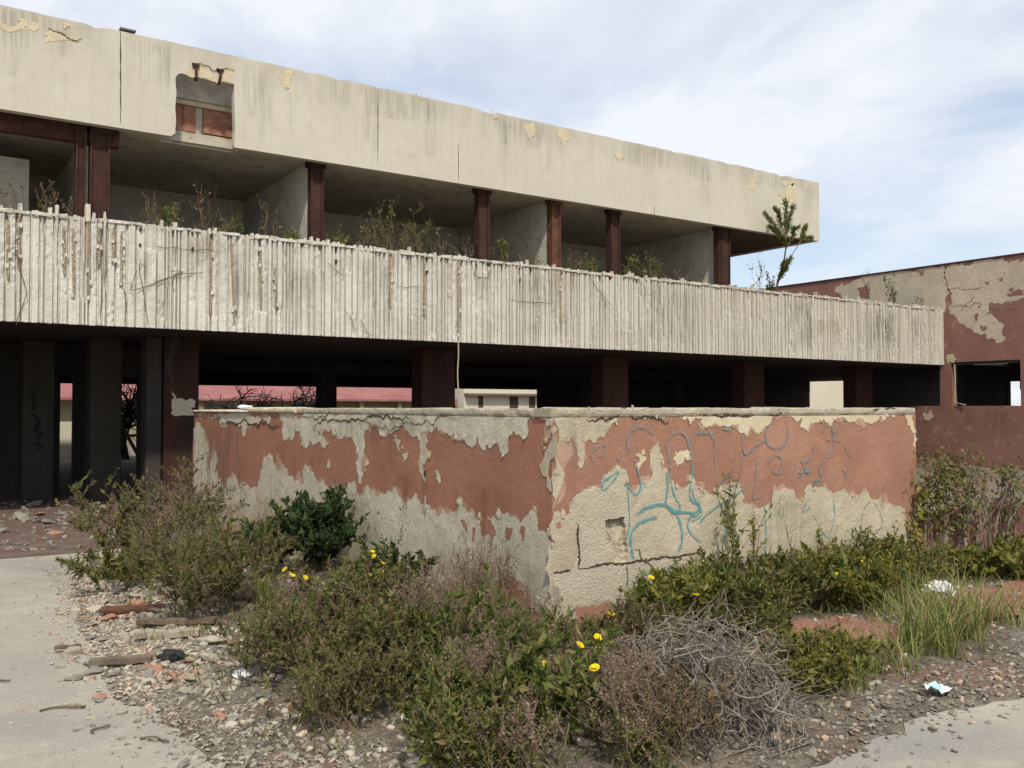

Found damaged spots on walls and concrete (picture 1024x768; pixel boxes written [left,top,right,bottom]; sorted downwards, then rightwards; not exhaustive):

peeling [0,15,82,43]
spalling [187,62,235,84]
peeling [835,258,1024,343]
peeling [171,391,934,634]
crack [554,524,701,586]